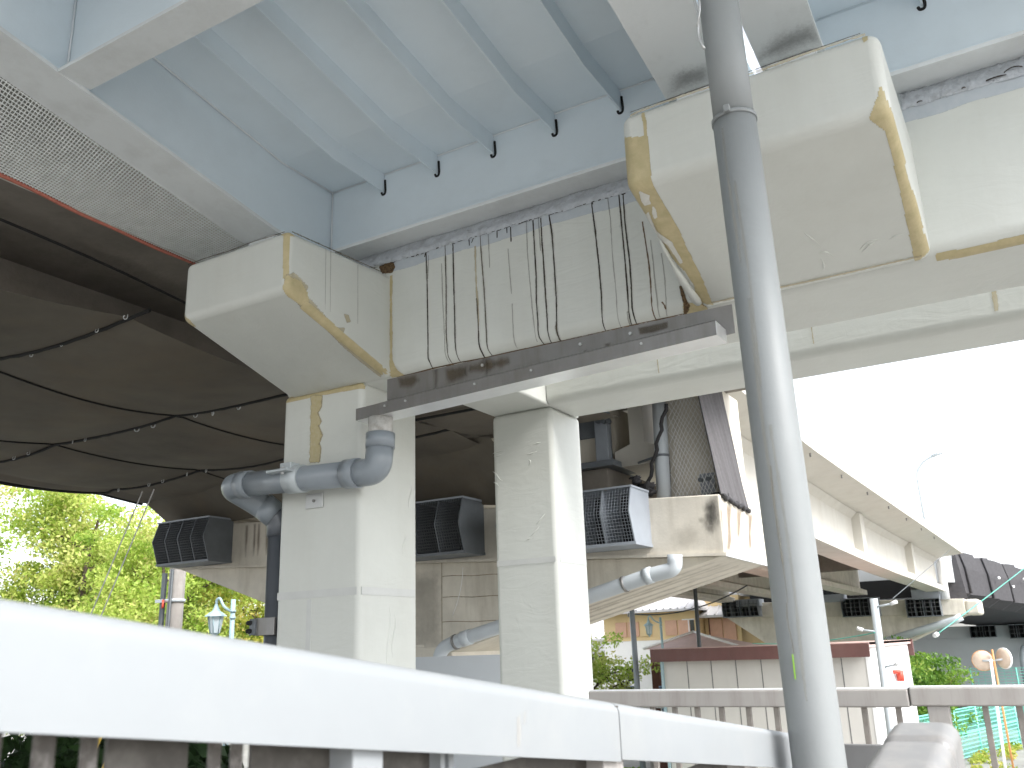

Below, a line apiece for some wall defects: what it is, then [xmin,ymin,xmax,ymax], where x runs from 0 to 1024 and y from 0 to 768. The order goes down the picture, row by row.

peeling [748,33,868,75]
rust [379,262,395,274]
water stain [424,252,433,368]
water stain [445,243,460,364]
peeling [188,85,734,378]
water stain [468,236,492,358]
water stain [532,215,561,344]
water stain [591,202,606,331]
water stain [618,195,637,325]
water stain [642,222,666,319]
peeling [780,56,1024,288]
peeling [286,383,366,463]